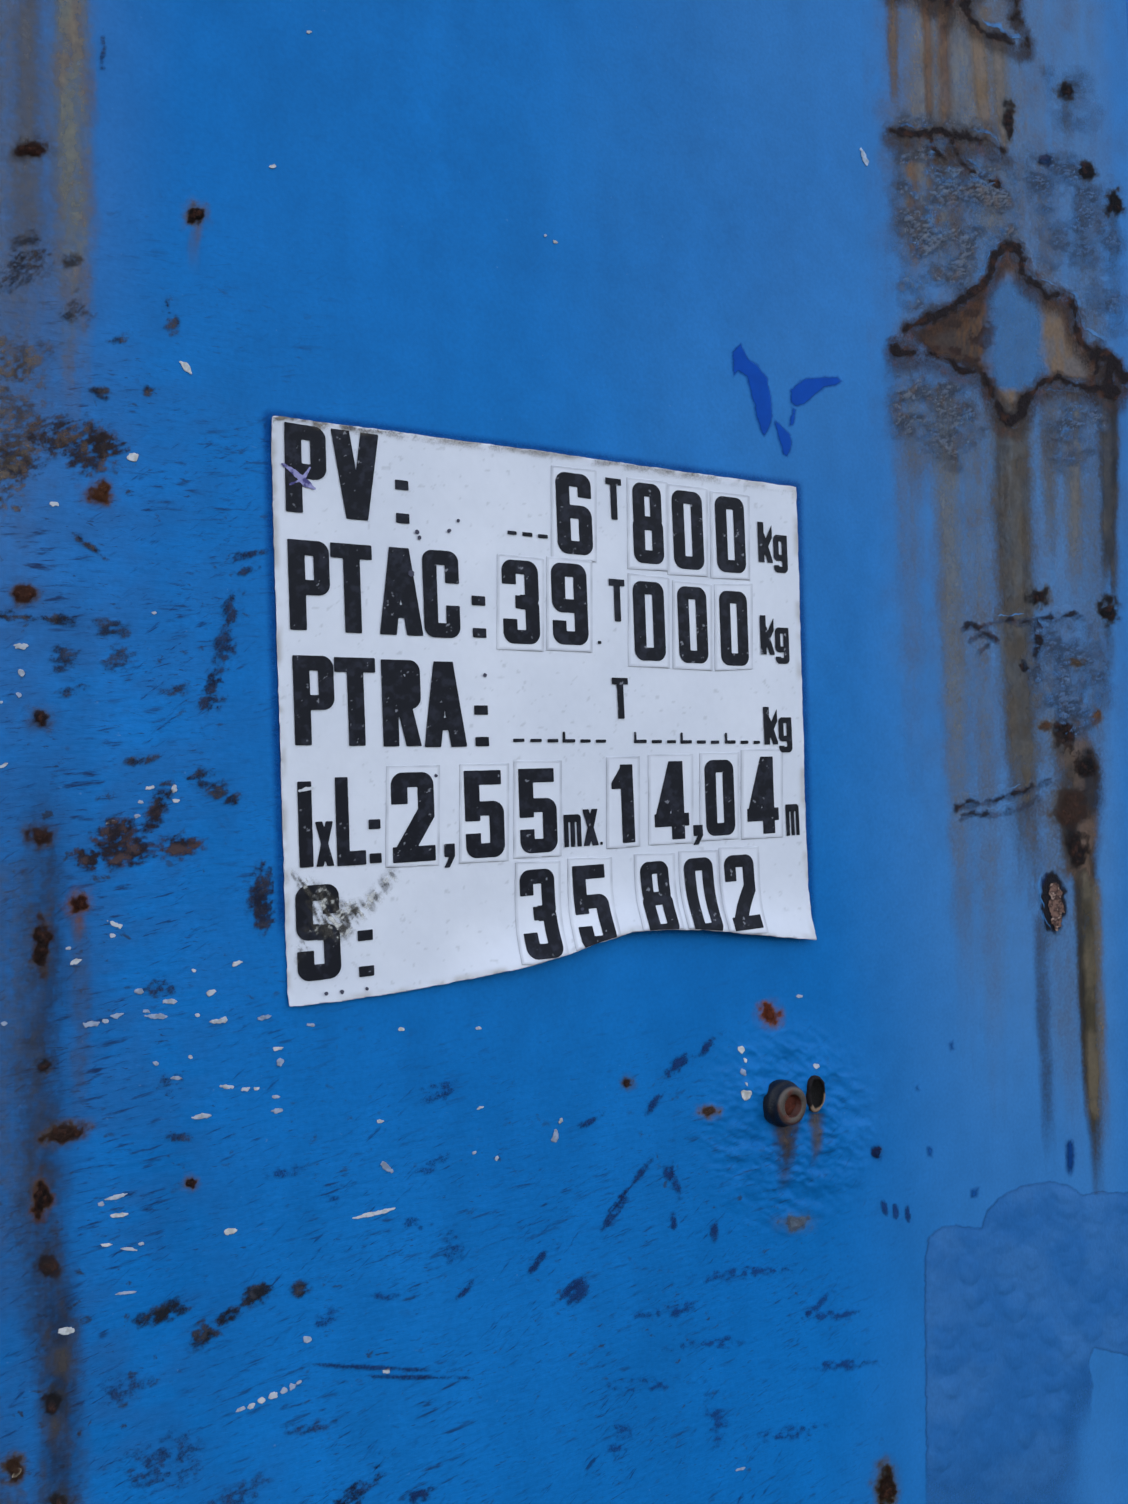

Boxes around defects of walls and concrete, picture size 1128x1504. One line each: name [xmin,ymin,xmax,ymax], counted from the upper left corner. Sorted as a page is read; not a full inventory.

rust [1057,80,1077,108]
rust [888,0,1035,252]
rust [13,0,91,314]
rust [1078,160,1097,184]
rust [1104,187,1125,218]
rust [86,480,112,505]
rust [11,584,38,603]
rust [32,709,50,727]
rust [909,255,1120,1159]
rust [777,1113,822,1162]
rust [0,864,94,1504]
rust [875,1460,898,1504]